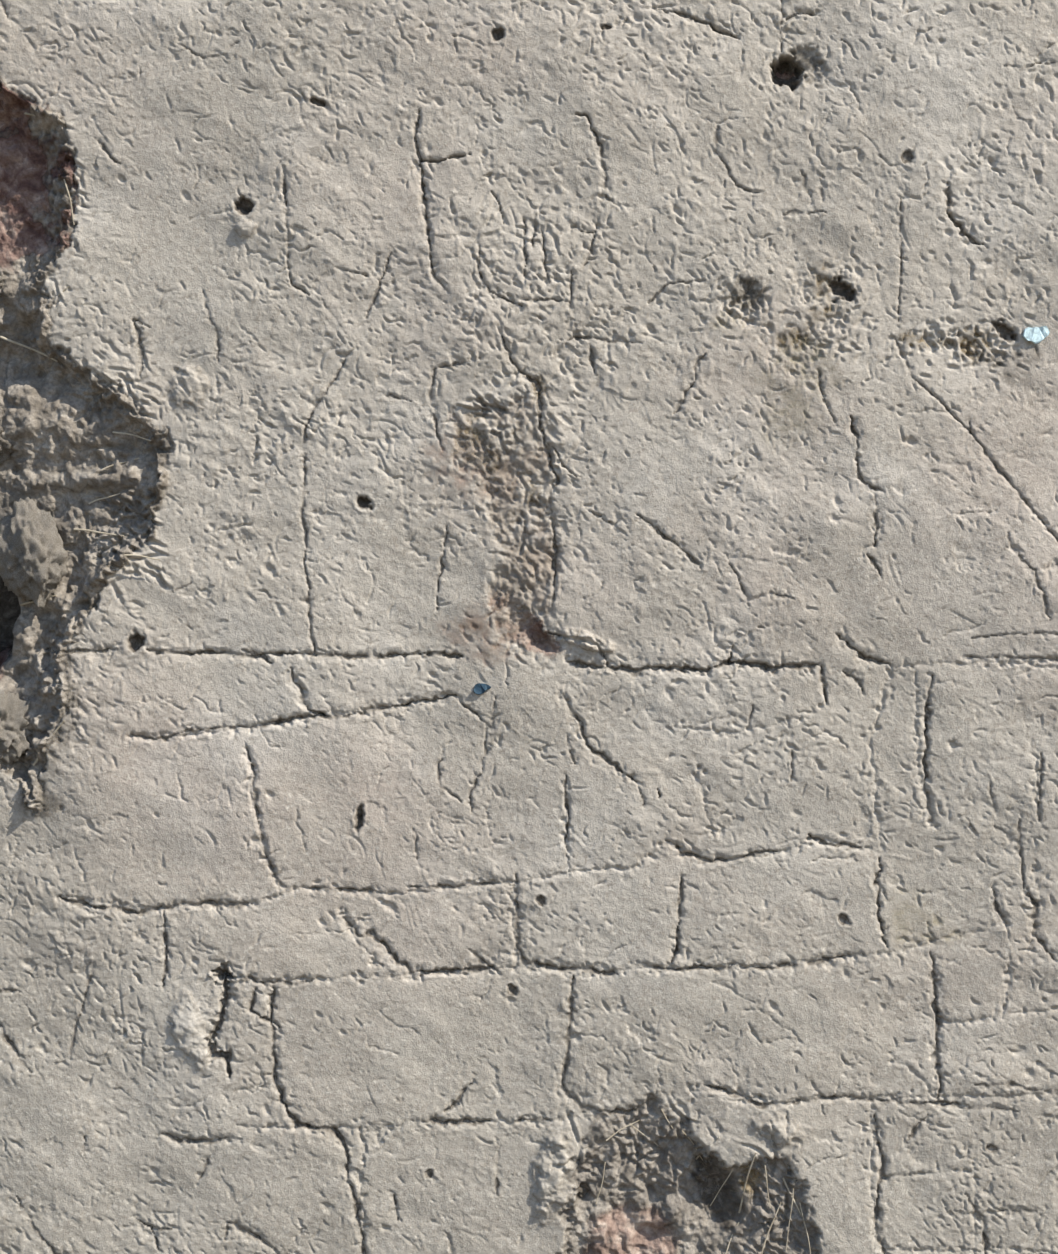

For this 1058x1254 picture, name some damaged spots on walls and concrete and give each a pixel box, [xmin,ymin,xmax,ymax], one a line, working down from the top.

spalling [0,78,171,815]
crack [819,375,882,576]
crack [134,363,496,873]
crack [550,633,889,702]
crack [348,922,492,974]
crack [410,882,615,1099]
crack [564,714,660,856]
crack [653,846,842,971]
crack [969,753,1054,960]
crack [244,976,366,1254]
spalling [562,1094,819,1254]
crack [704,956,1030,1254]